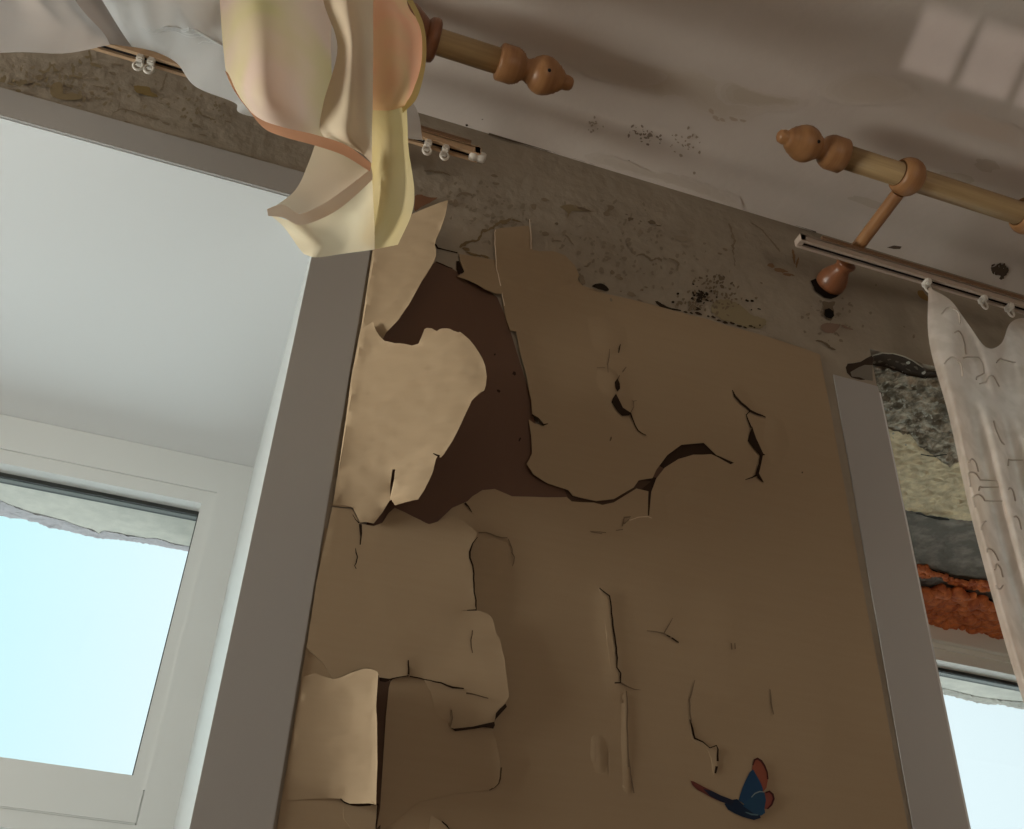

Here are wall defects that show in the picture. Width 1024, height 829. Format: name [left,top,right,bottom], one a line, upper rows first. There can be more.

damp [424,170,766,329]
peeling [283,200,509,829]
crack [597,344,645,435]
crack [564,390,765,534]
spalling [846,352,972,521]
crack [599,588,639,793]
crack [689,680,719,773]